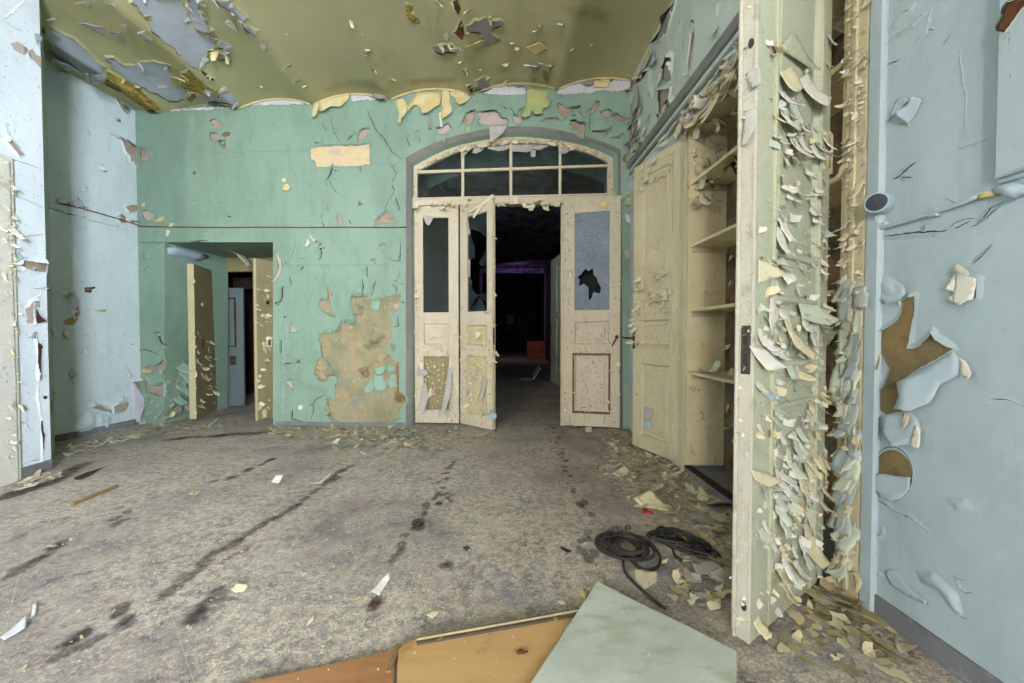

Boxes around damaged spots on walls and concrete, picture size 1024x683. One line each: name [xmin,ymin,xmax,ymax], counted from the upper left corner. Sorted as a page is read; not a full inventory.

crack [269,111,412,327]
peeling [0,0,736,678]
peeling [874,277,972,503]
crack [883,198,1004,265]